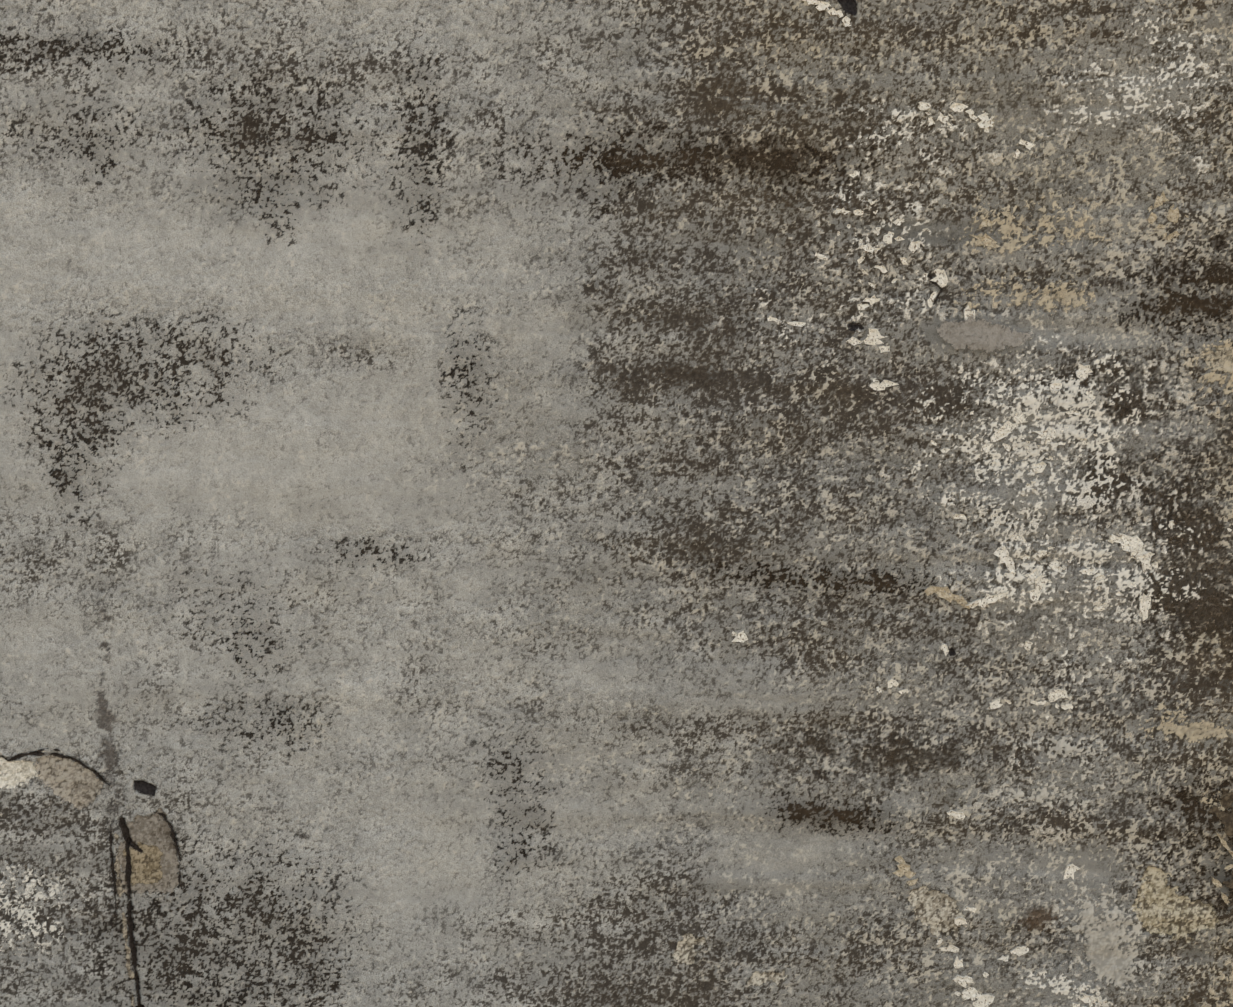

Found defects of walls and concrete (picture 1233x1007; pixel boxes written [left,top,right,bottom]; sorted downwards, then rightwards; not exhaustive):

peeling [1076,363,1096,400]
peeling [973,409,1098,496]
peeling [924,531,1158,622]
spalling [0,753,103,810]
crack [1,748,110,786]
spalling [116,808,182,897]
crack [154,812,181,886]
crack [109,818,144,1007]